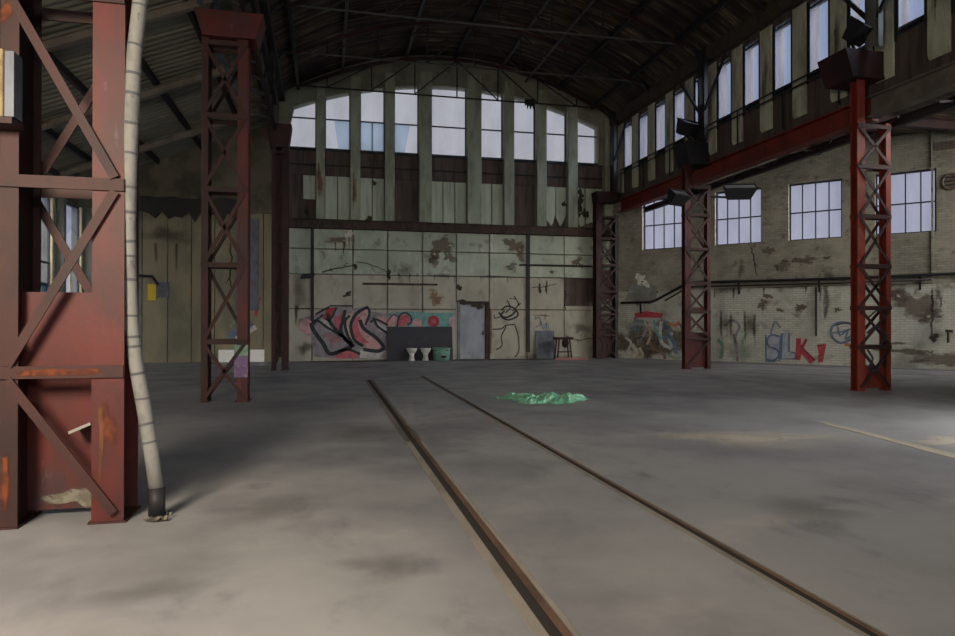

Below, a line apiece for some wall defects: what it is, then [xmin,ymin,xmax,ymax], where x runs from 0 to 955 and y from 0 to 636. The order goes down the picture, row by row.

peeling [429,235,457,267]
peeling [503,238,524,270]
peeling [891,288,955,368]
corrosion [1,457,9,505]